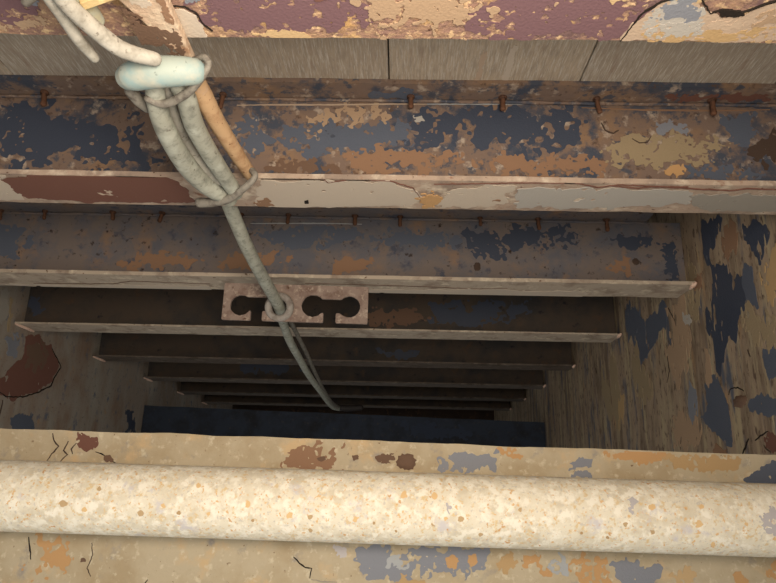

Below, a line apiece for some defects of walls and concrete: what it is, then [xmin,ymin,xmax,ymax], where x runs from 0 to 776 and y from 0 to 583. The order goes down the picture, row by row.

crack [620,0,671,42]
peeling [620,1,671,41]
peeling [680,2,776,43]
crack [702,0,776,14]
corrosion [306,102,398,133]
corrosion [264,128,731,178]
peeling [0,175,24,201]
peeling [255,180,422,208]
peeling [437,184,776,212]
peeling [369,288,589,297]
crack [47,433,77,462]
crack [293,557,337,583]